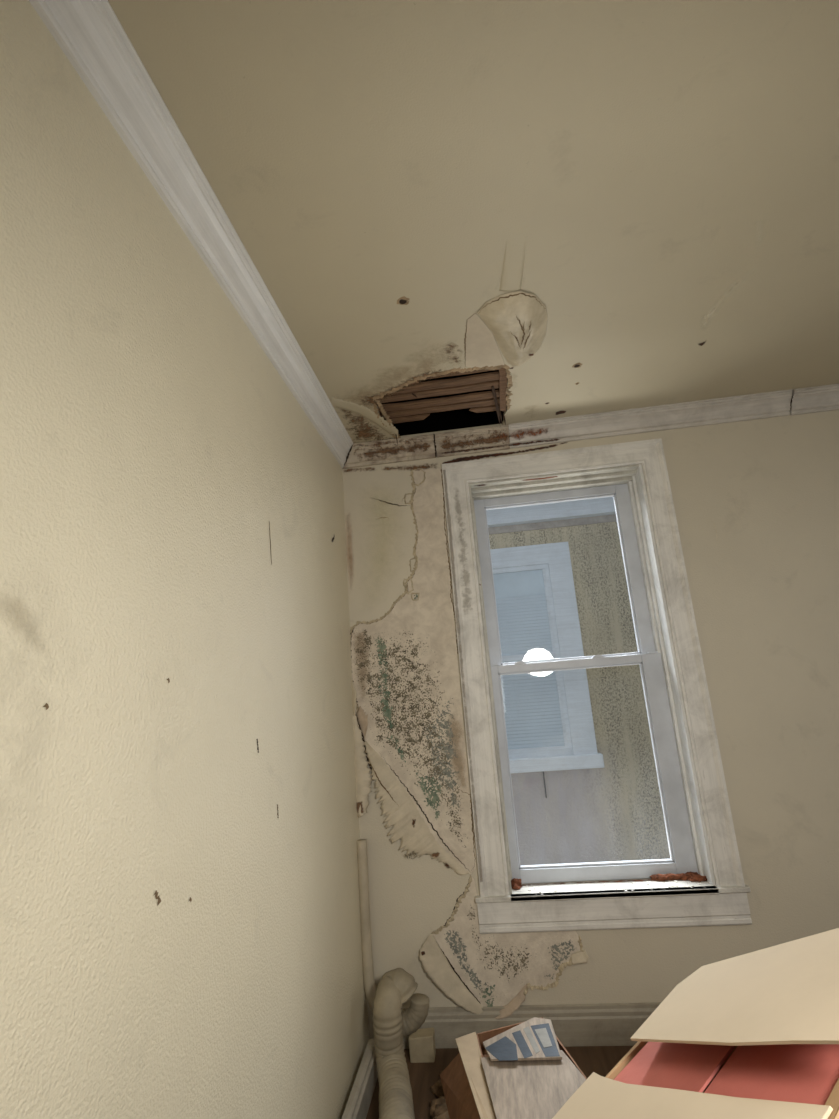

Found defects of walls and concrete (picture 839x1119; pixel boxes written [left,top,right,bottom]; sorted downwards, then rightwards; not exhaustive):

water stain [343,410,510,472]
water stain [354,629,468,848]
peeling [350,468,589,1019]